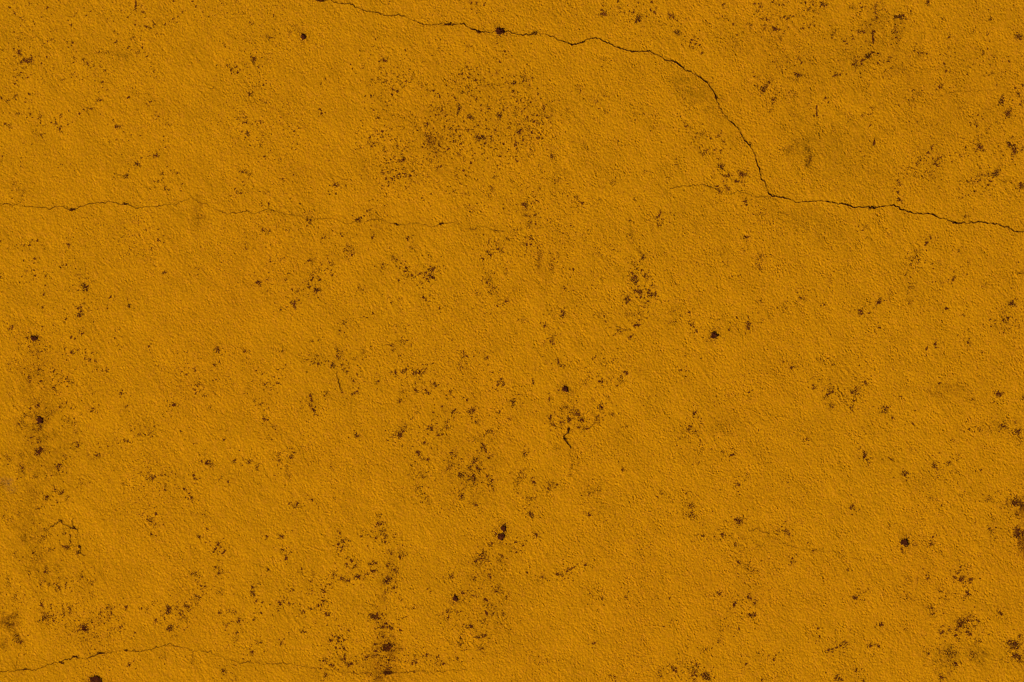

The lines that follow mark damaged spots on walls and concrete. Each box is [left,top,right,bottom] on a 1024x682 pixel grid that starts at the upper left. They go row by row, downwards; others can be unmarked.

crack [316,0,1024,232]